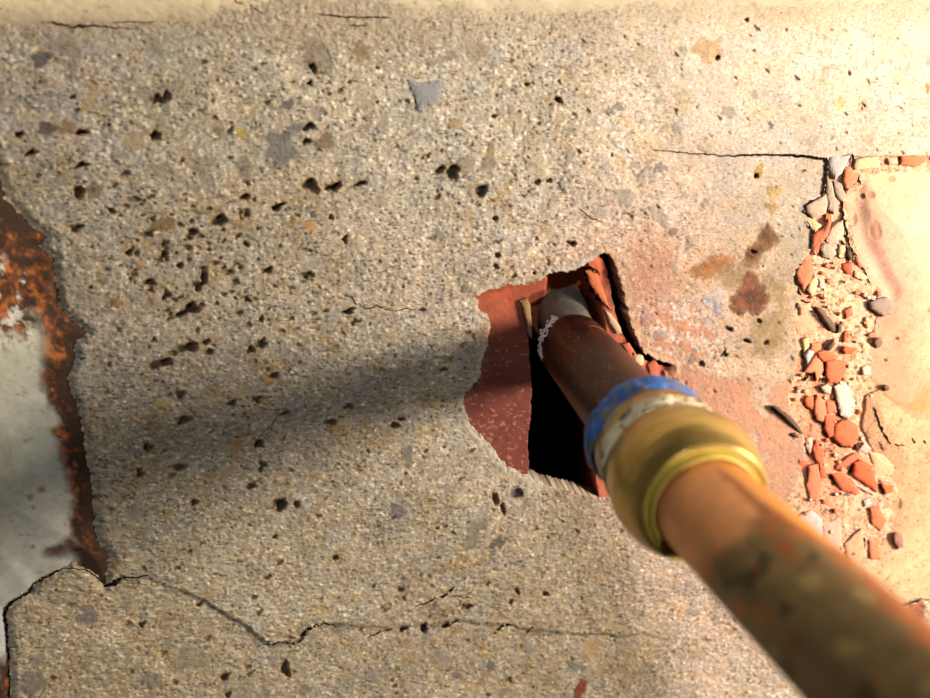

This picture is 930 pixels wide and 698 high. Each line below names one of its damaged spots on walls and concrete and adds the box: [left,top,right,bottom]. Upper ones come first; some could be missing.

peeling [0,291,23,351]
corrosion [0,180,109,586]
spalling [472,284,499,314]
spalling [457,337,547,490]
spalling [538,246,681,383]
spalling [785,155,930,570]
crack [3,567,149,697]
crack [259,621,339,646]
crack [366,586,471,638]
crack [494,623,534,634]